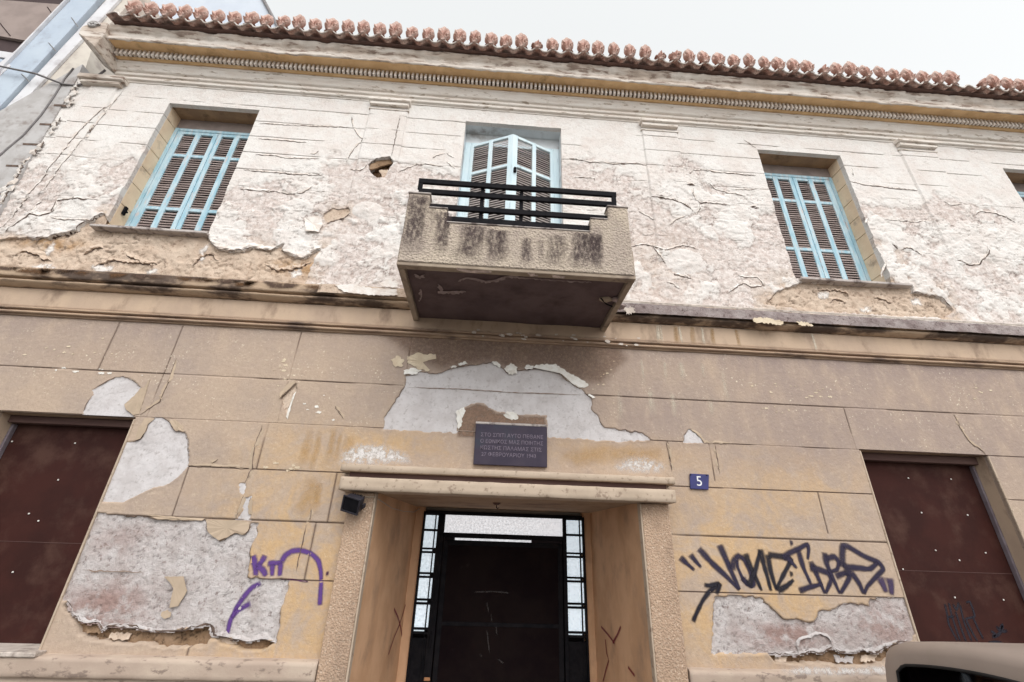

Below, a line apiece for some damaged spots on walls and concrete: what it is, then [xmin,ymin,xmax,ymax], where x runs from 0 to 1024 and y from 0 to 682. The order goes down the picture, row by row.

crack [0,91,123,240]
flaking render [0,215,406,297]
peeling [304,208,350,232]
leakage [405,197,425,242]
leakage [459,226,506,255]
leakage [574,233,601,260]
crack [634,169,755,289]
crack [729,275,764,293]
flaking render [599,283,1024,335]
peeling [383,352,649,442]
flaking render [63,369,290,649]
flaking render [711,595,915,665]